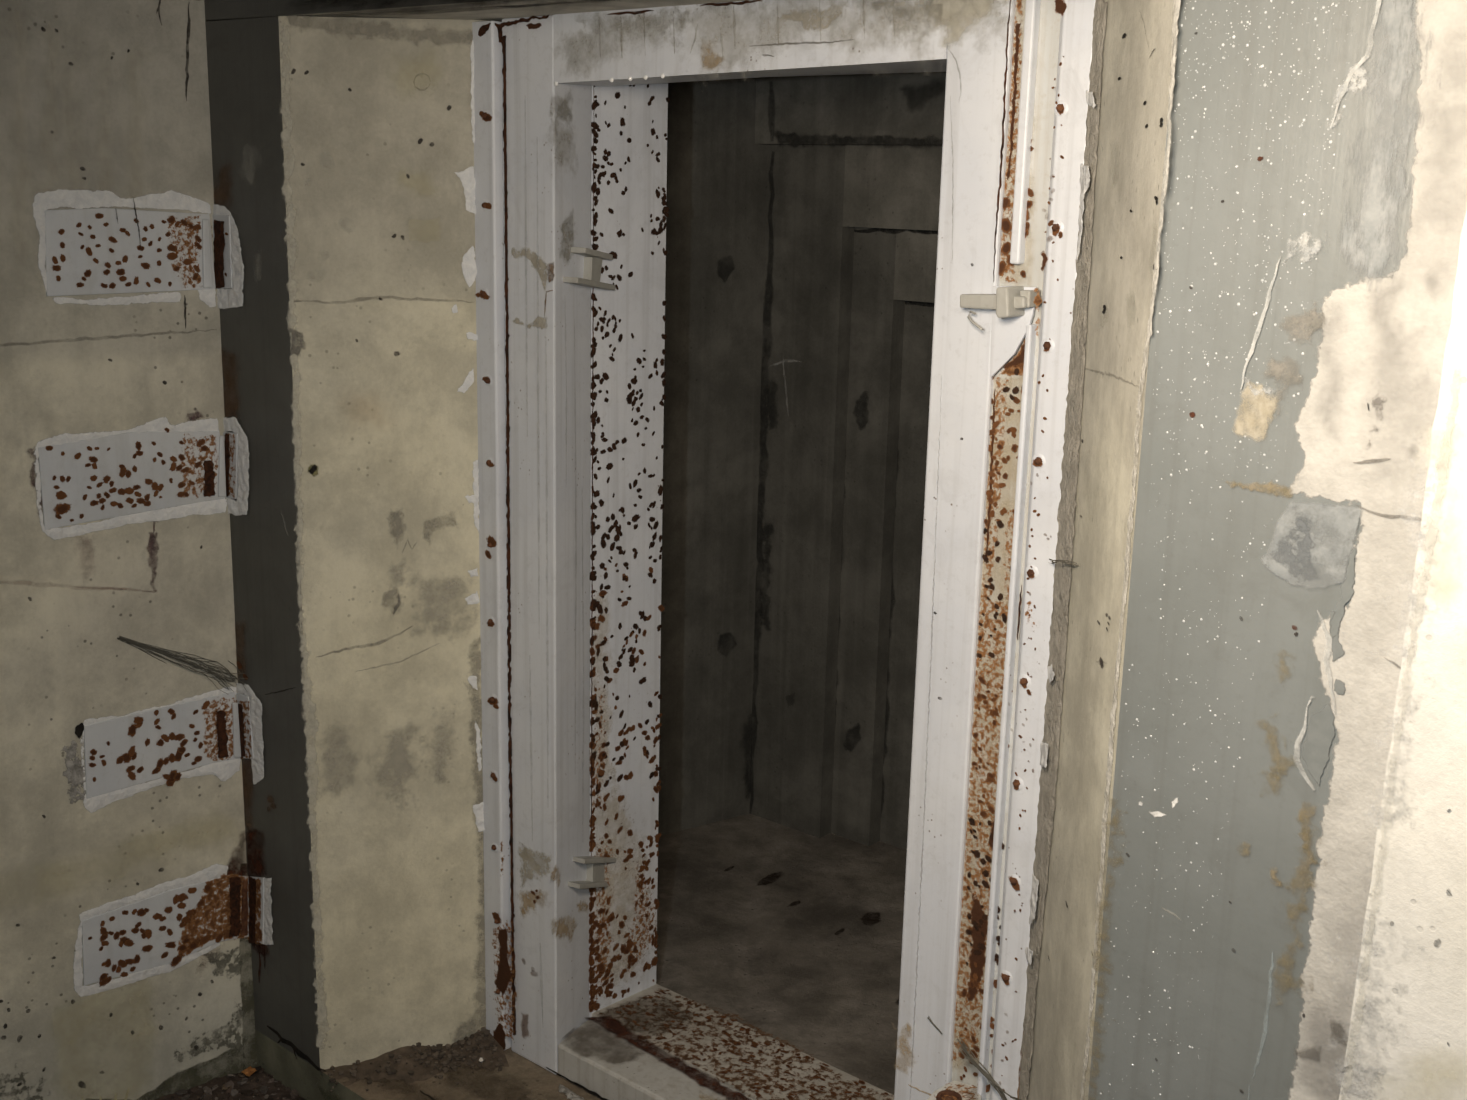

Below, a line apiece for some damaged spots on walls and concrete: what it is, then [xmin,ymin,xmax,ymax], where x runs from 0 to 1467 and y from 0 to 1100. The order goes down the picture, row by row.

corrosion [1055,0,1067,16]
corrosion [52,213,228,289]
corrosion [46,357,237,522]
corrosion [552,84,891,1100]
corrosion [897,0,1064,1100]
peeling [1235,0,1467,1100]
corrosion [89,698,276,812]
corrosion [88,823,268,986]